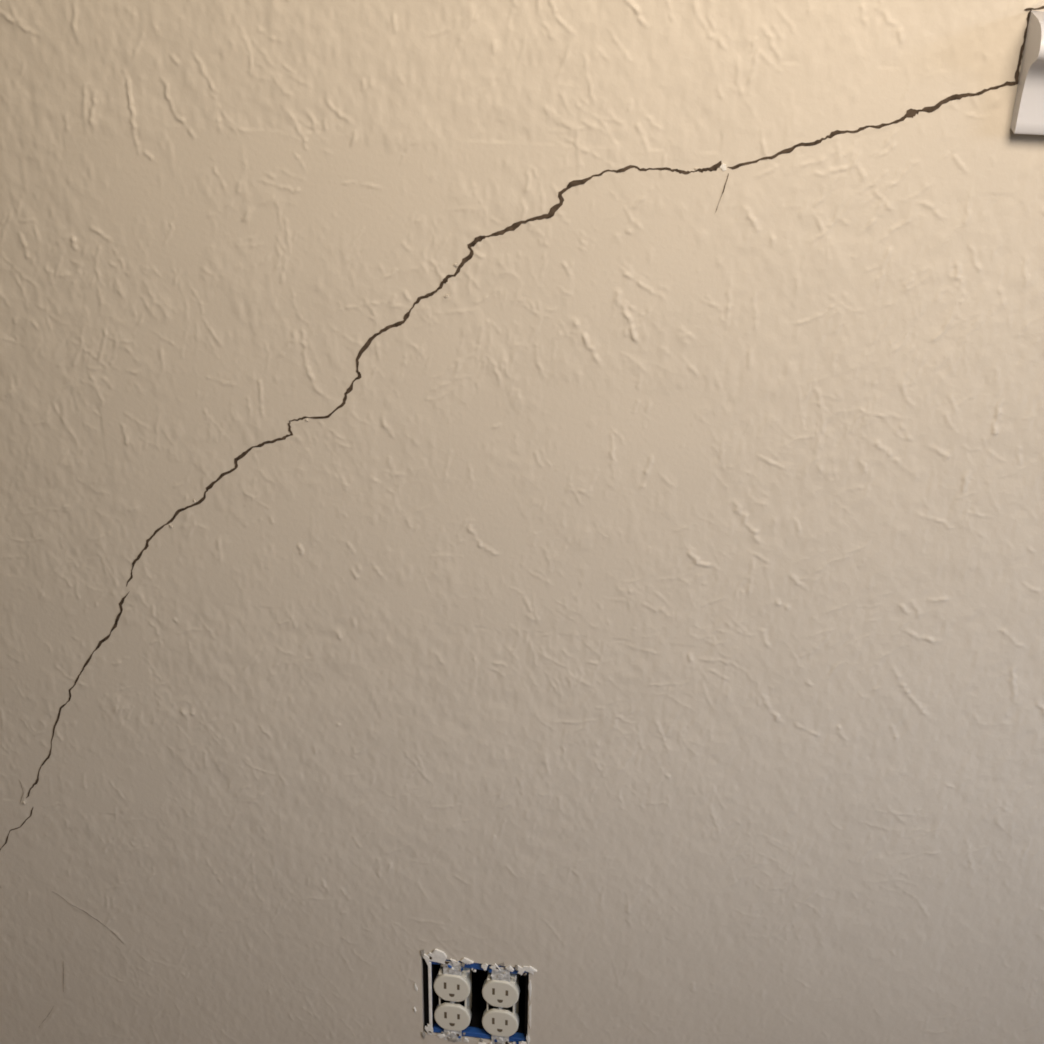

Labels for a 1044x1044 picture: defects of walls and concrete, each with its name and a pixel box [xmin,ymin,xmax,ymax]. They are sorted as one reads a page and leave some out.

crack [19,6,1044,805]
crack [0,808,33,850]